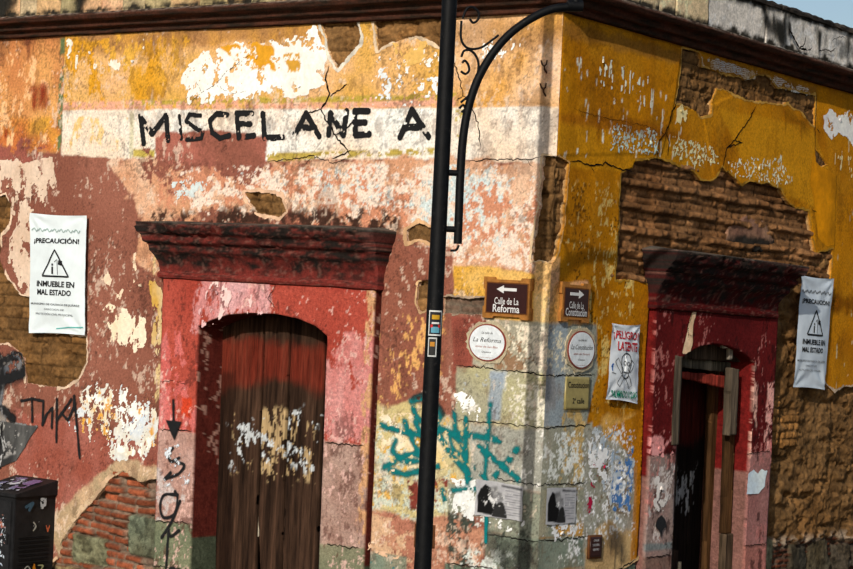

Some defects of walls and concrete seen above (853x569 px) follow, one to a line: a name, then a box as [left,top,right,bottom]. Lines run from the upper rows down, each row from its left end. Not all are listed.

peeling [181,18,441,106]
flaking render [0,156,88,391]
peeling [95,252,163,356]
flaking render [242,188,288,221]
flaking render [403,218,431,247]
crack [454,63,541,167]
flaking render [529,153,570,264]
crack [570,160,632,172]
flaking render [610,46,853,569]
crack [723,107,756,165]
flaking render [52,382,159,569]